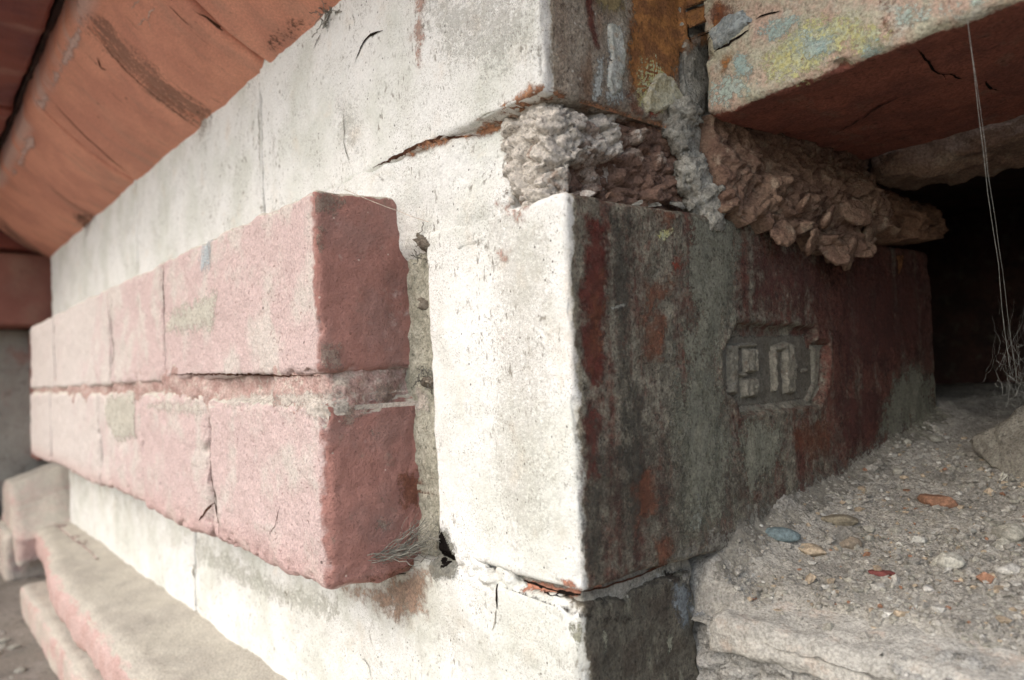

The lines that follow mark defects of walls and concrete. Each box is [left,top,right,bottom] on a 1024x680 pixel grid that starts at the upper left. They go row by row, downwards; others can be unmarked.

crack [356,30,383,58]
crack [917,49,998,91]
crack [375,135,478,167]
peeling [408,138,448,157]
spalling [464,73,687,214]
spalling [699,114,949,271]
crack [199,429,219,524]
crack [492,557,694,630]